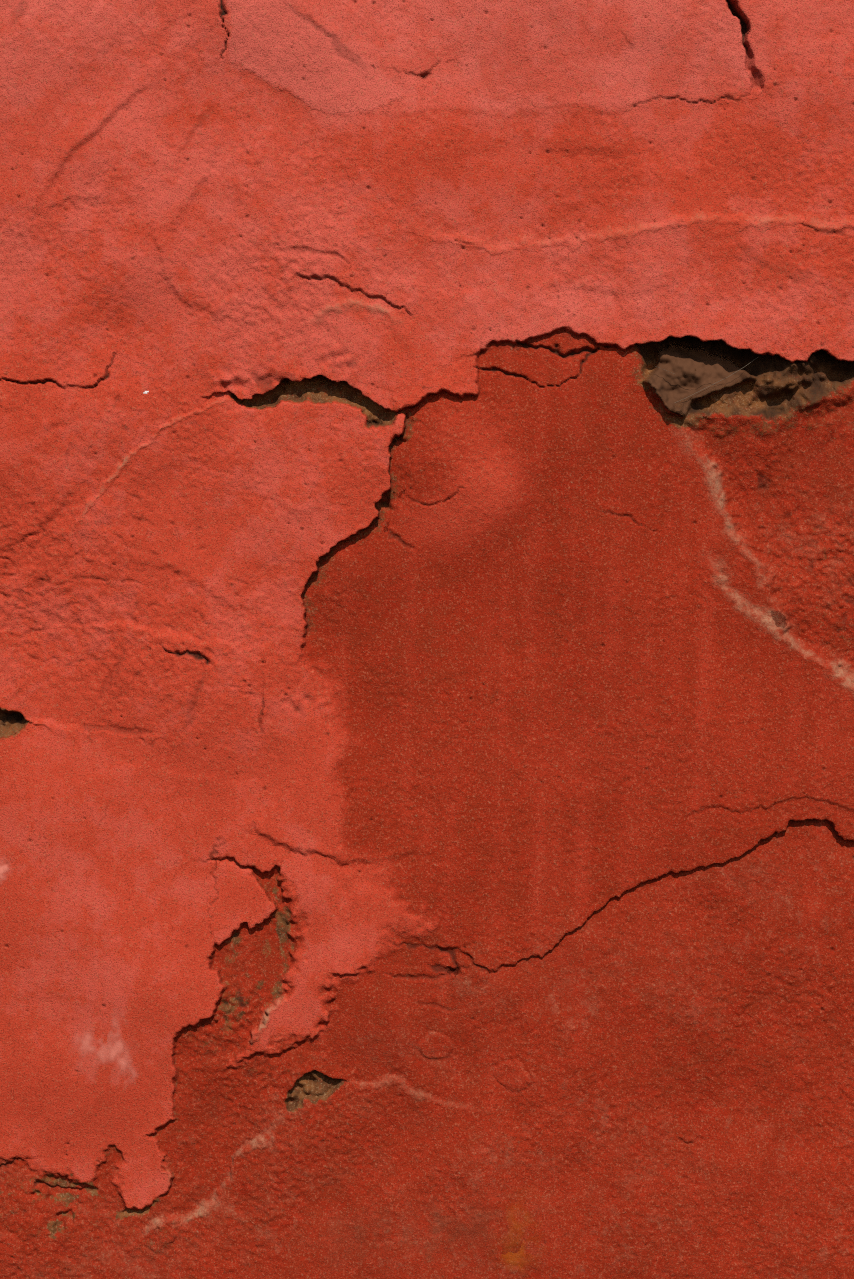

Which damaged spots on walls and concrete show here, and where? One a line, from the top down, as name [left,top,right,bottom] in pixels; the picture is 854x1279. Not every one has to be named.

crack [615,0,766,114]
crack [0,348,126,412]
peeling [0,336,854,1279]
crack [359,795,854,983]